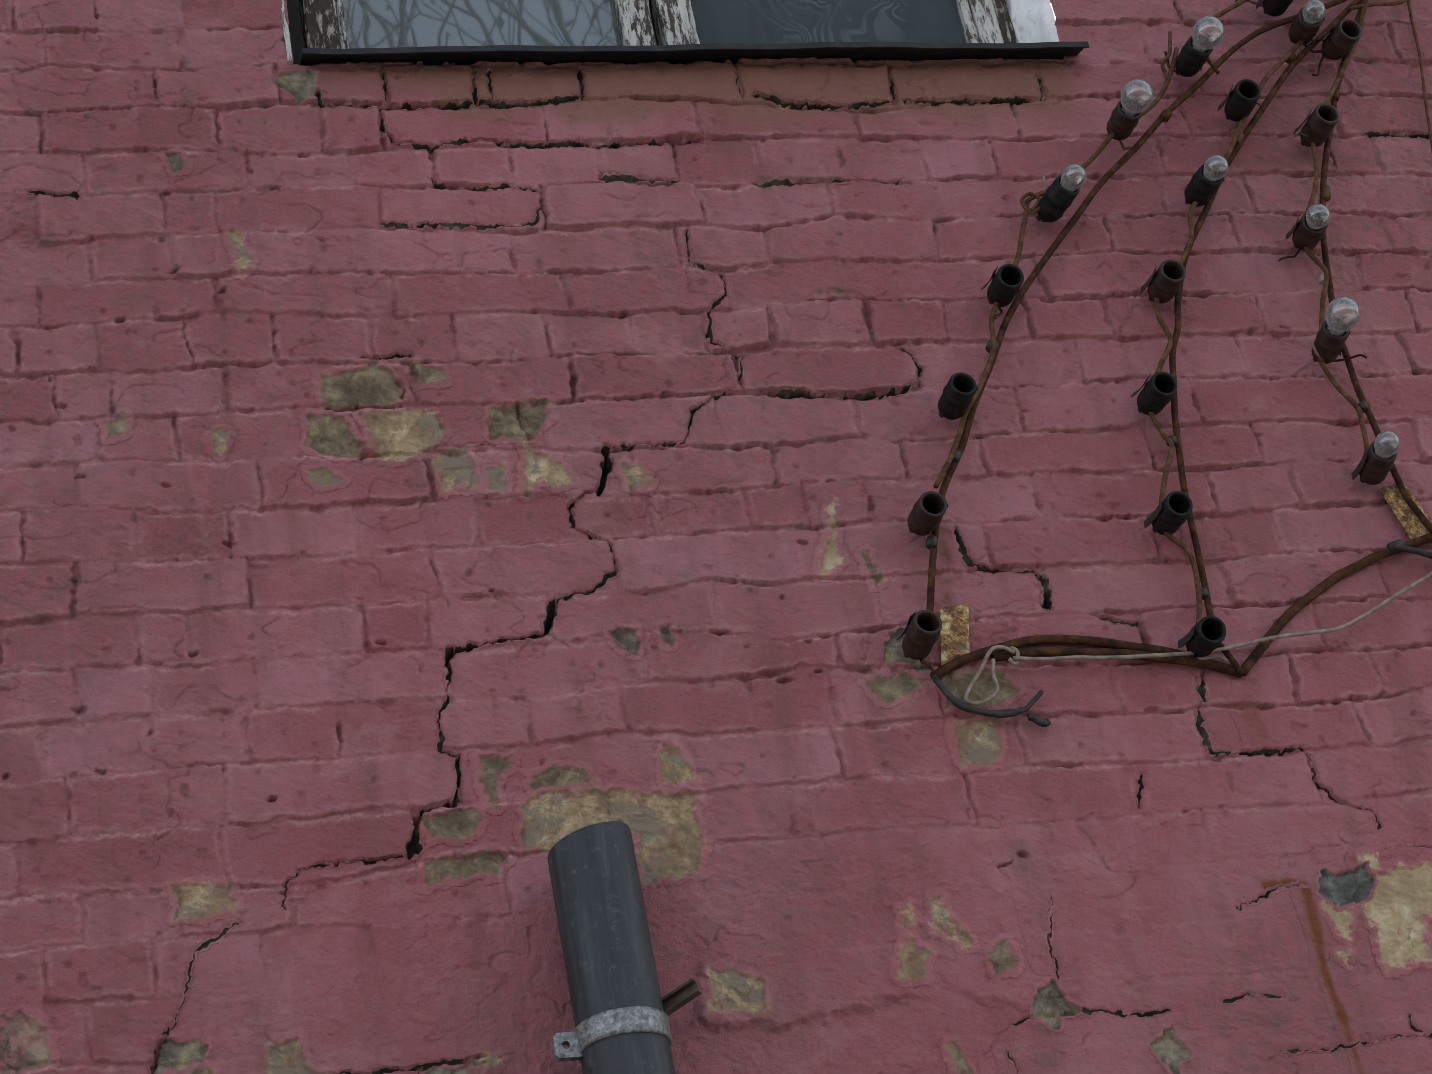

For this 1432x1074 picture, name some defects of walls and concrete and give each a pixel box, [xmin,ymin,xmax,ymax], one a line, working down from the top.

peeling [298,350,583,503]
crack [279,227,746,910]
peeling [413,731,714,895]
crack [1194,668,1432,849]
crack [148,918,245,1074]
crack [330,1054,466,1074]
peeling [421,1047,512,1074]
peeling [698,955,775,1029]
peeling [888,887,1084,1032]
crack [1005,888,1174,1074]
crack [1275,1011,1432,1055]
peeling [1315,846,1432,979]